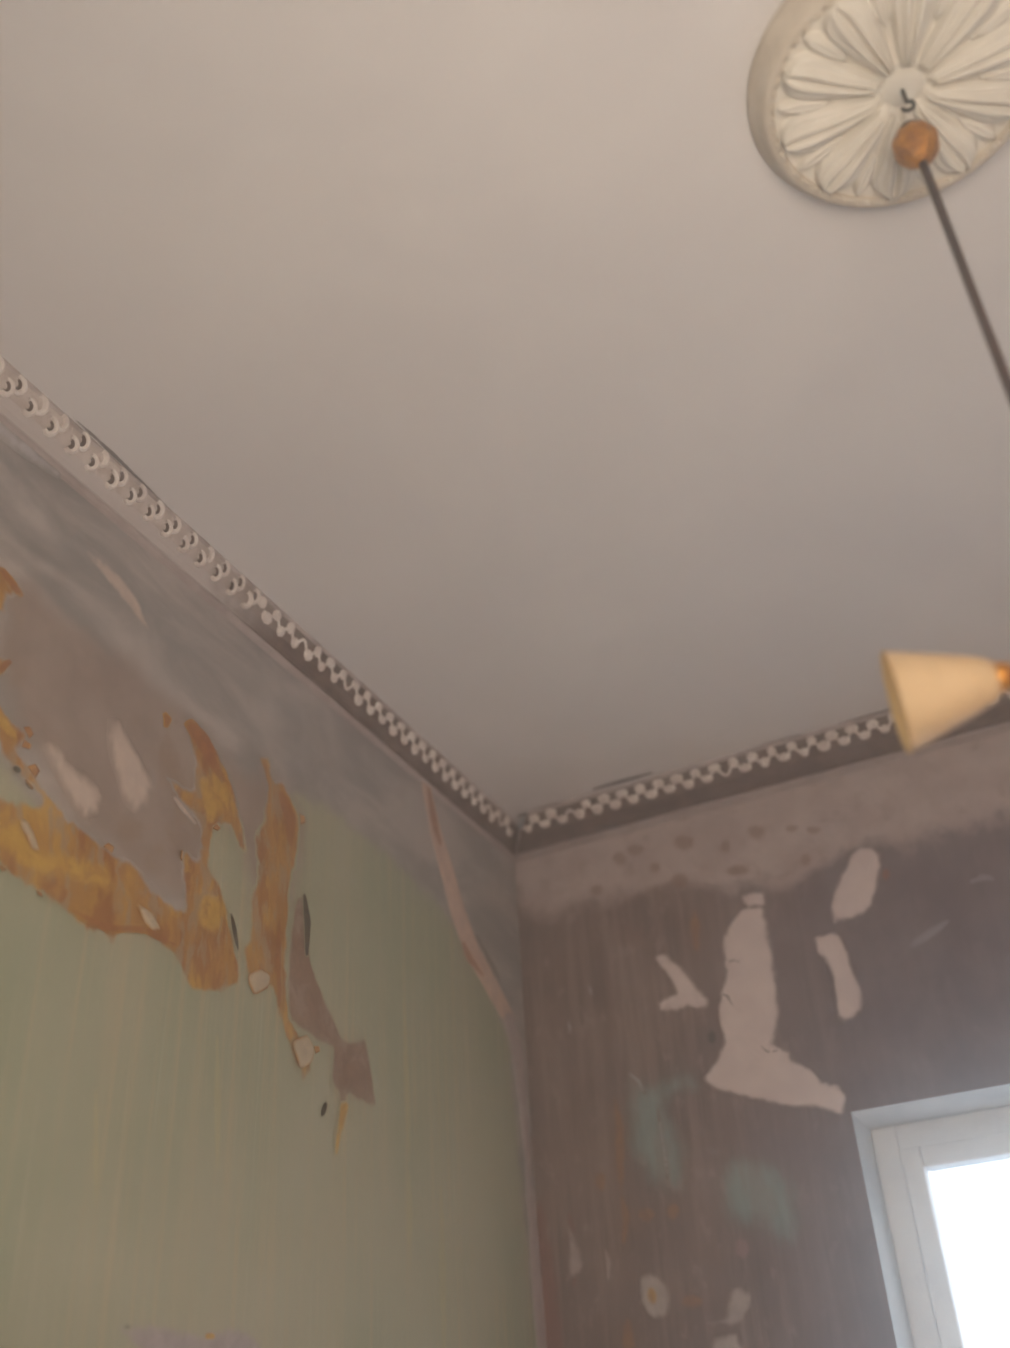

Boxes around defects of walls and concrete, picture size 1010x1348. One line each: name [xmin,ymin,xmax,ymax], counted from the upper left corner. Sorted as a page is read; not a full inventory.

peeling [0,558,377,1157]